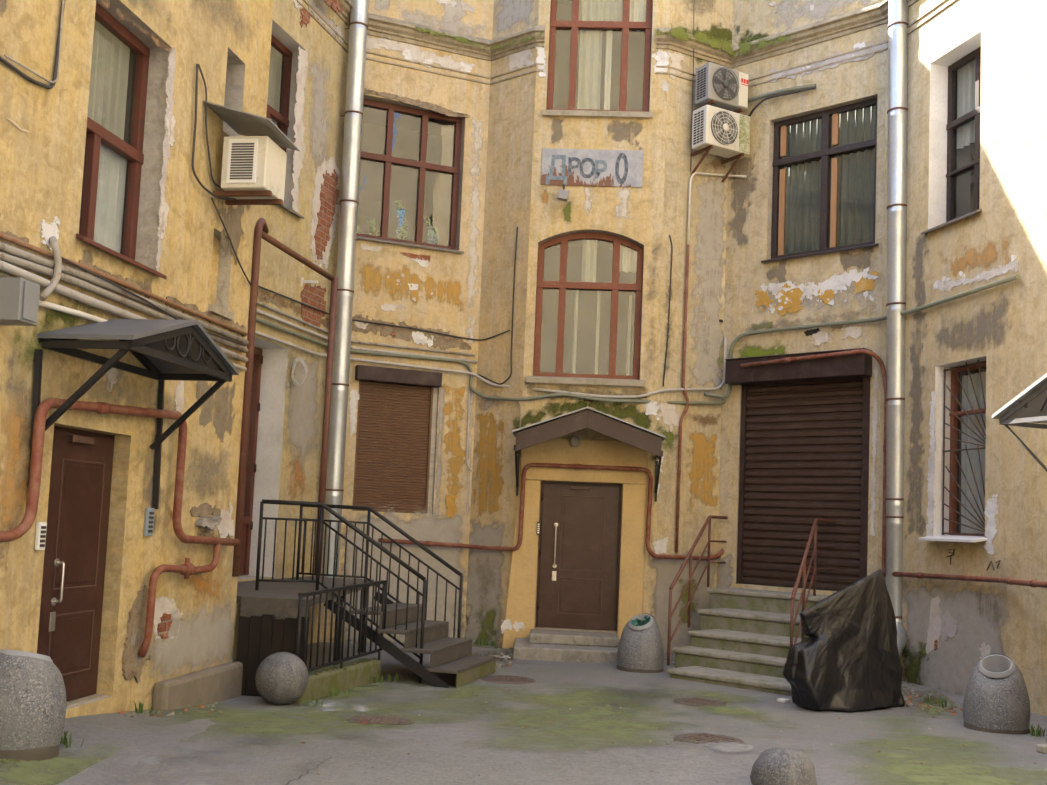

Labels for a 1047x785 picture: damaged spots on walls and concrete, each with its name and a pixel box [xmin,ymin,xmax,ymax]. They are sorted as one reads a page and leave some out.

peeling [292,0,345,44]
spalling [290,46,340,270]
spalling [361,244,382,252]
spalling [400,252,431,268]
spalling [300,283,326,330]
spalling [352,273,471,351]
peeling [755,267,880,318]
spalling [190,502,235,546]